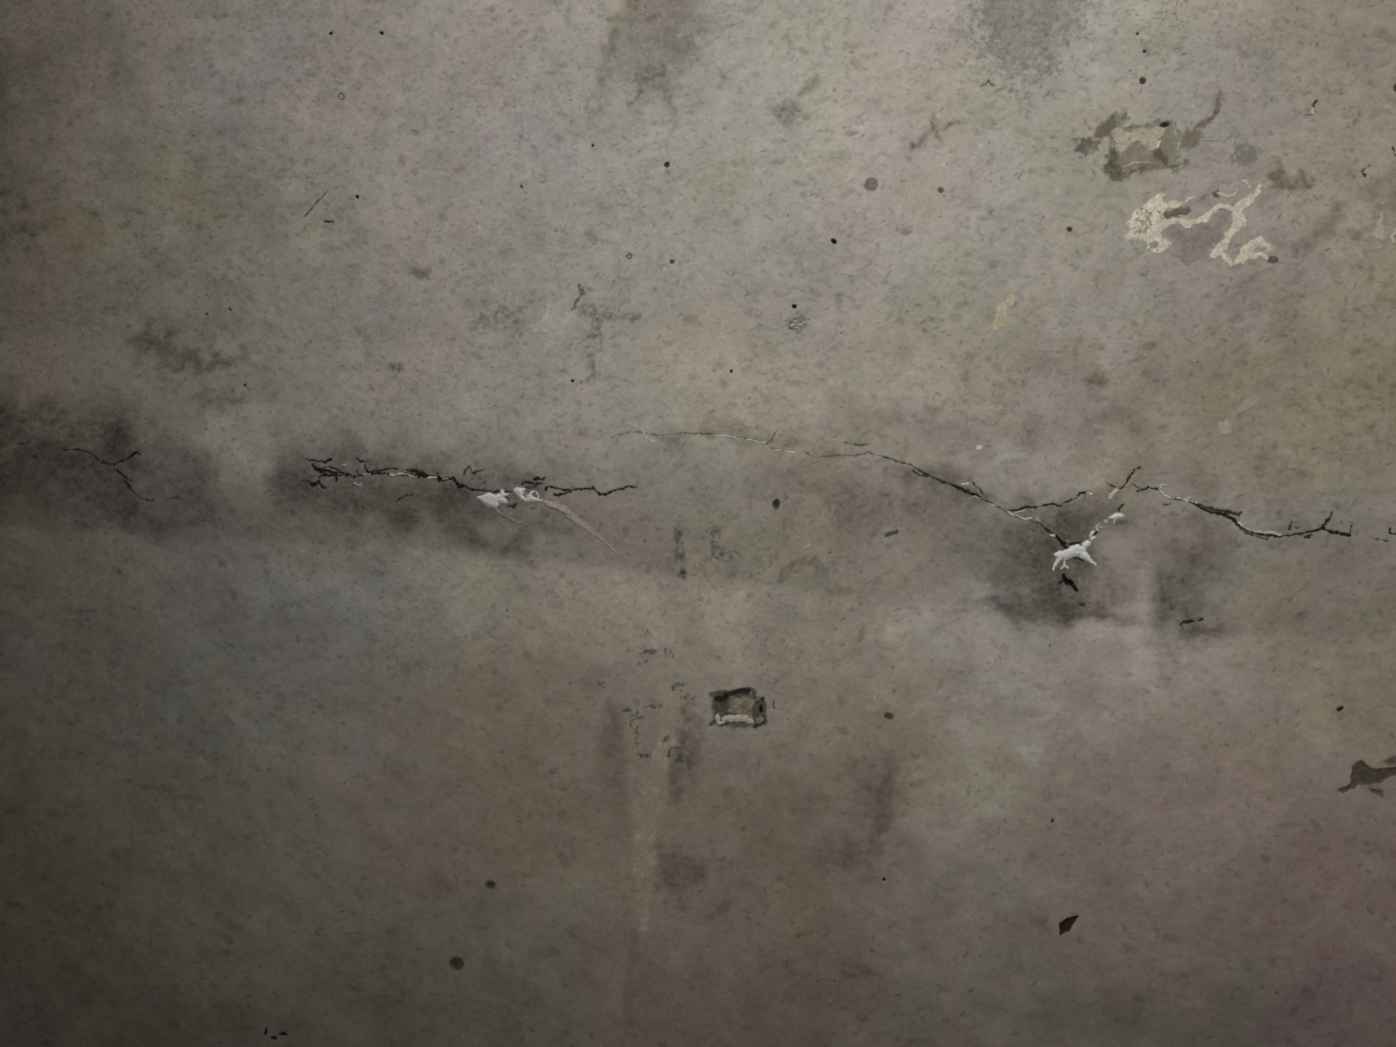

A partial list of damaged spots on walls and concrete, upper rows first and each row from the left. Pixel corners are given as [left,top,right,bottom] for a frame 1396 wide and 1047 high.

spalling [1075,114,1220,181]
peeling [1125,144,1278,267]
crack [66,449,179,501]
crack [302,458,636,509]
leakage [477,487,620,556]
leakage [1052,488,1124,571]
crack [854,444,1396,549]
spalling [710,688,766,728]
spalling [1339,761,1396,796]